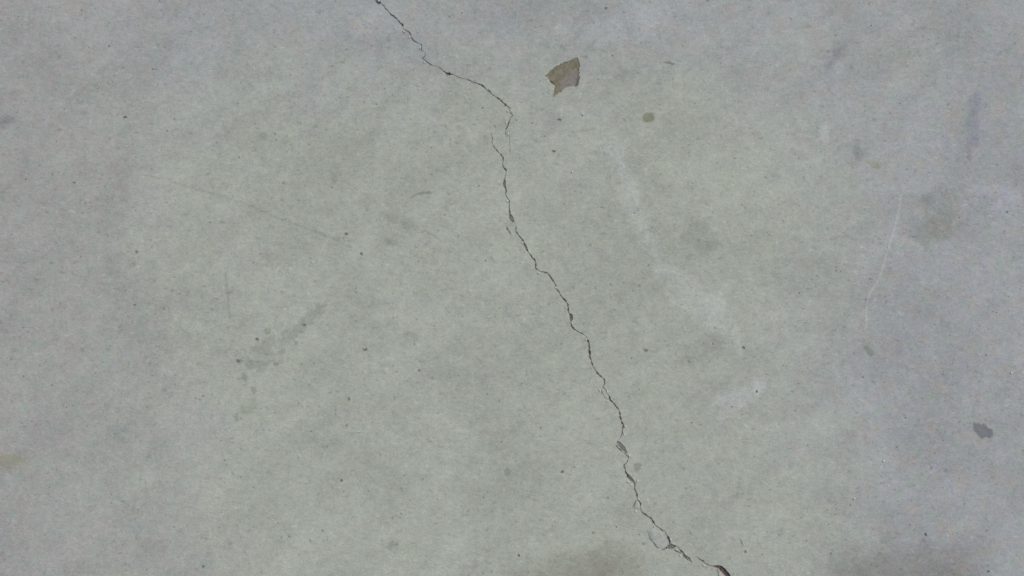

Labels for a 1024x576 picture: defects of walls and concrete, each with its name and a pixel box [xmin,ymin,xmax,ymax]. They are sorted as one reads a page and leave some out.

crack [375,0,731,576]